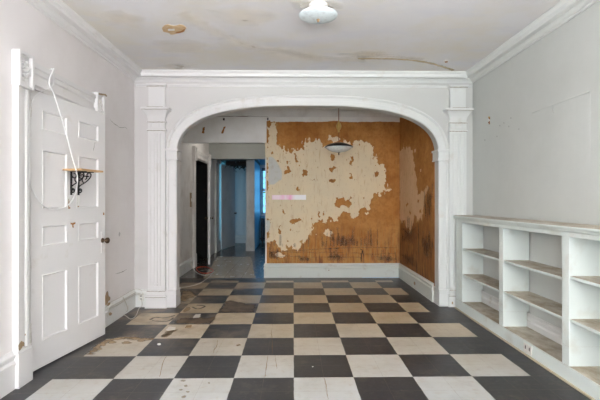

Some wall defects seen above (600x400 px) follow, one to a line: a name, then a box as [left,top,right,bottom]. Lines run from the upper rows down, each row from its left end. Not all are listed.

spalling [162,24,186,35]